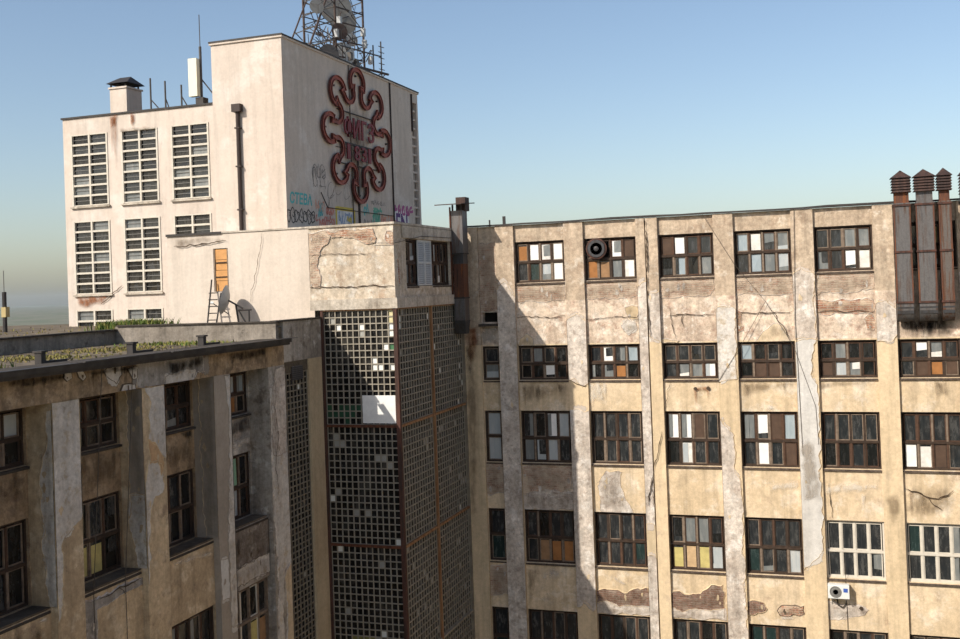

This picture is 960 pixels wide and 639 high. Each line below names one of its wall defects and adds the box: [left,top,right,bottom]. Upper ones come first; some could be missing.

spalling [308,228,394,289]
peeling [38,399,83,624]
peeling [85,358,205,639]
peeling [478,241,660,639]
peeling [585,277,715,531]
peeling [671,417,805,639]
peeling [716,267,897,570]
crack [907,489,953,510]